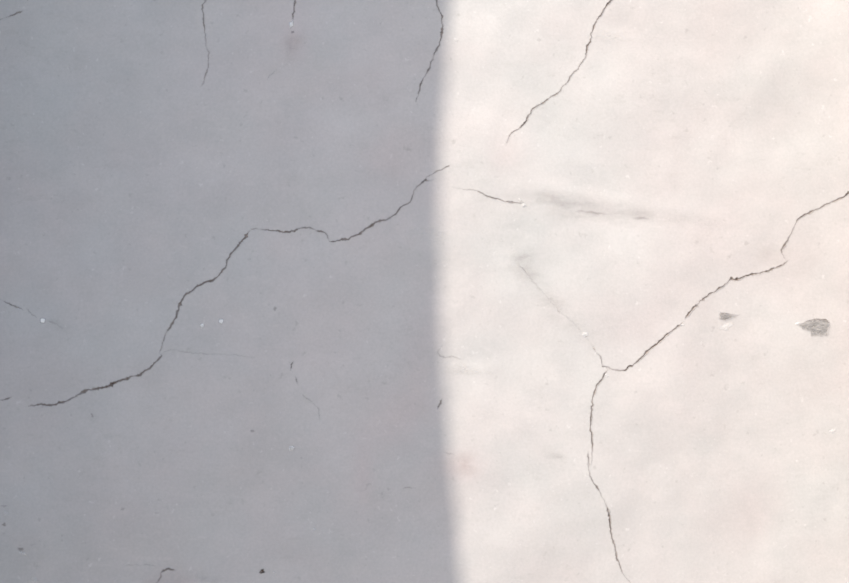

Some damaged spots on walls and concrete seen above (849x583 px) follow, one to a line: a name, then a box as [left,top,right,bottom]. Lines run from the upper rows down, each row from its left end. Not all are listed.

crack [419,0,443,92]
crack [509,0,612,136]
crack [168,166,448,330]
crack [588,191,849,459]
spalling [800,319,829,335]
crack [36,356,162,406]
crack [607,508,620,566]